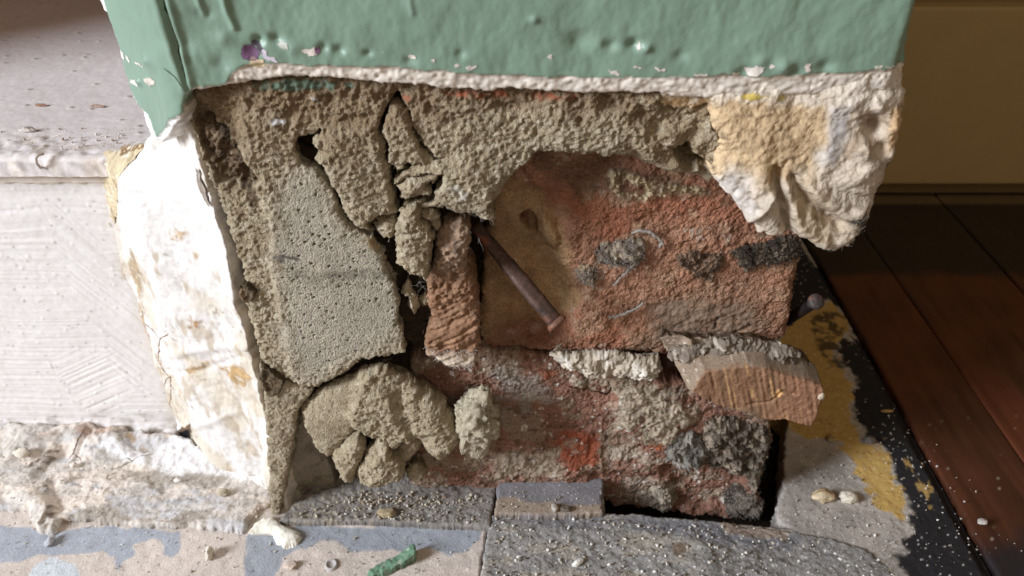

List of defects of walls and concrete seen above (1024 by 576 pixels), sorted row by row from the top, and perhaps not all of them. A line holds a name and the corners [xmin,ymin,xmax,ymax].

spalling [194,108,258,207]
flaking render [607,169,708,201]
spalling [239,276,258,303]
crack [144,323,171,403]
spalling [259,363,287,397]
spalling [291,416,339,495]